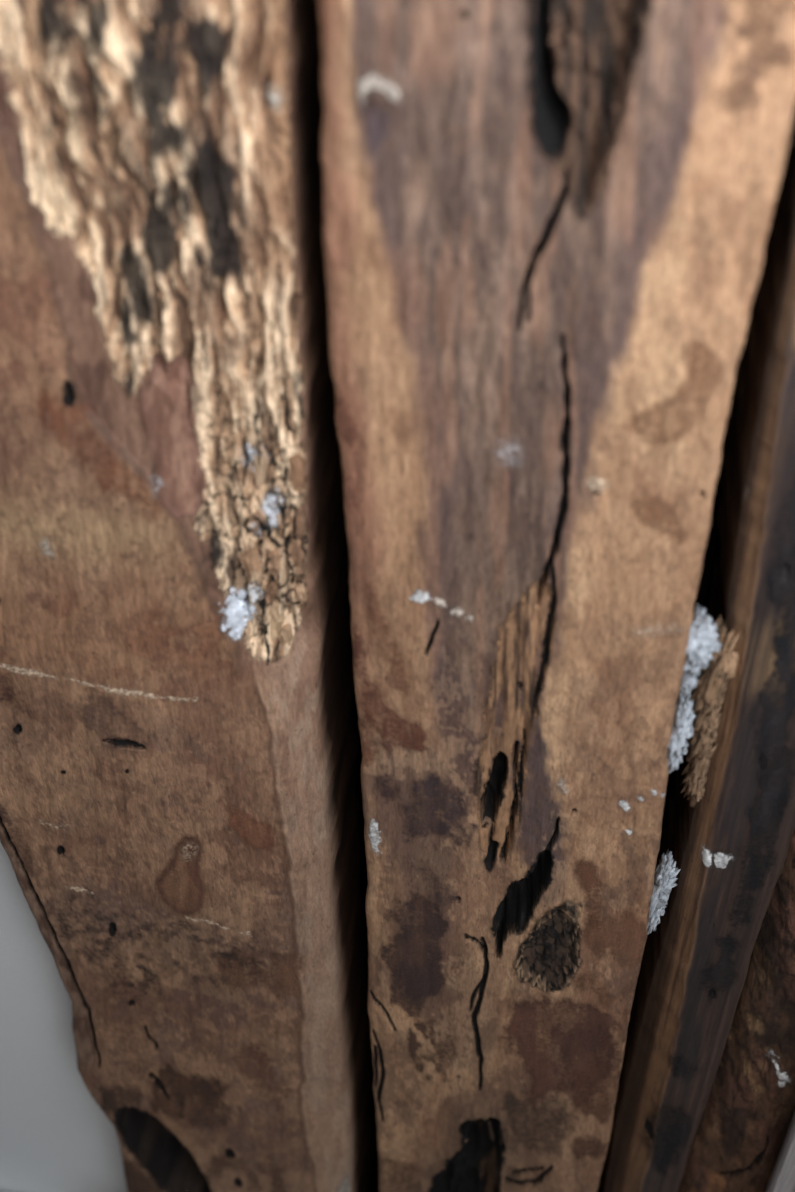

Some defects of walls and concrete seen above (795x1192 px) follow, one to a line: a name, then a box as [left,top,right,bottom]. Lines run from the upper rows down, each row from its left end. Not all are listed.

crack [518,166,568,325]
crack [532,334,571,713]
water stain [380,774,476,845]
water stain [381,868,459,1080]
crack [465,935,488,1087]
water stain [501,977,628,1159]
water stain [122,1160,161,1192]